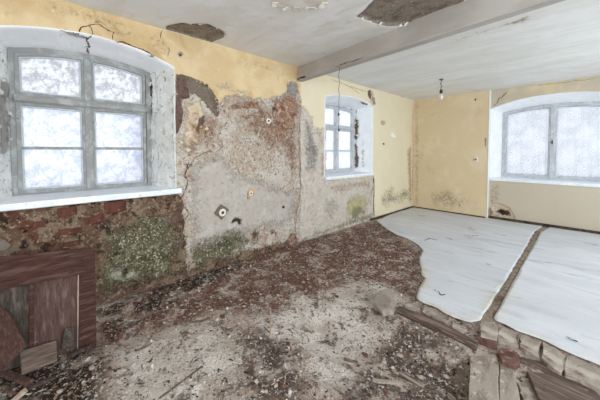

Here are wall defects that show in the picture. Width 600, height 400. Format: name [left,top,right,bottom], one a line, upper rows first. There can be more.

crack [60,24,170,59]
peeling [0,72,374,305]
crack [175,144,223,249]
water stain [347,195,368,218]
spalling [486,201,515,219]